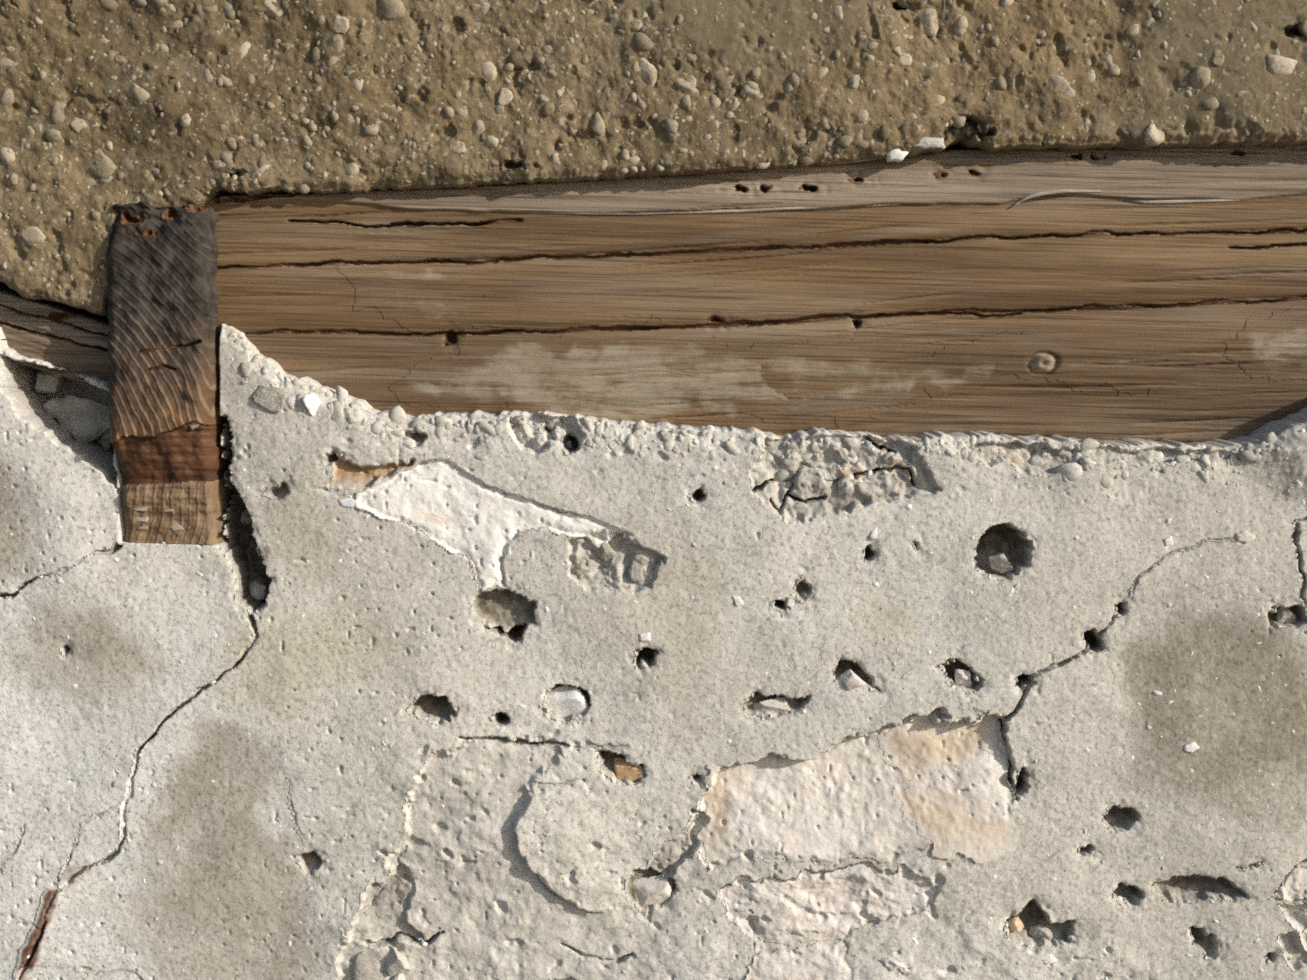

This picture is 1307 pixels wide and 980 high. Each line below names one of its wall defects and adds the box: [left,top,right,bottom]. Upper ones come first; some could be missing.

crack [0,542,122,598]
crack [34,964,144,980]
crack [57,613,259,891]
water stain [97,450,440,980]
spalling [324,455,668,632]
peeling [334,735,676,980]
spalling [506,411,586,455]
spalling [647,707,1015,980]
crack [970,538,1236,802]
water stain [1098,578,1307,841]
crack [1270,858,1307,906]
crack [1292,517,1307,622]